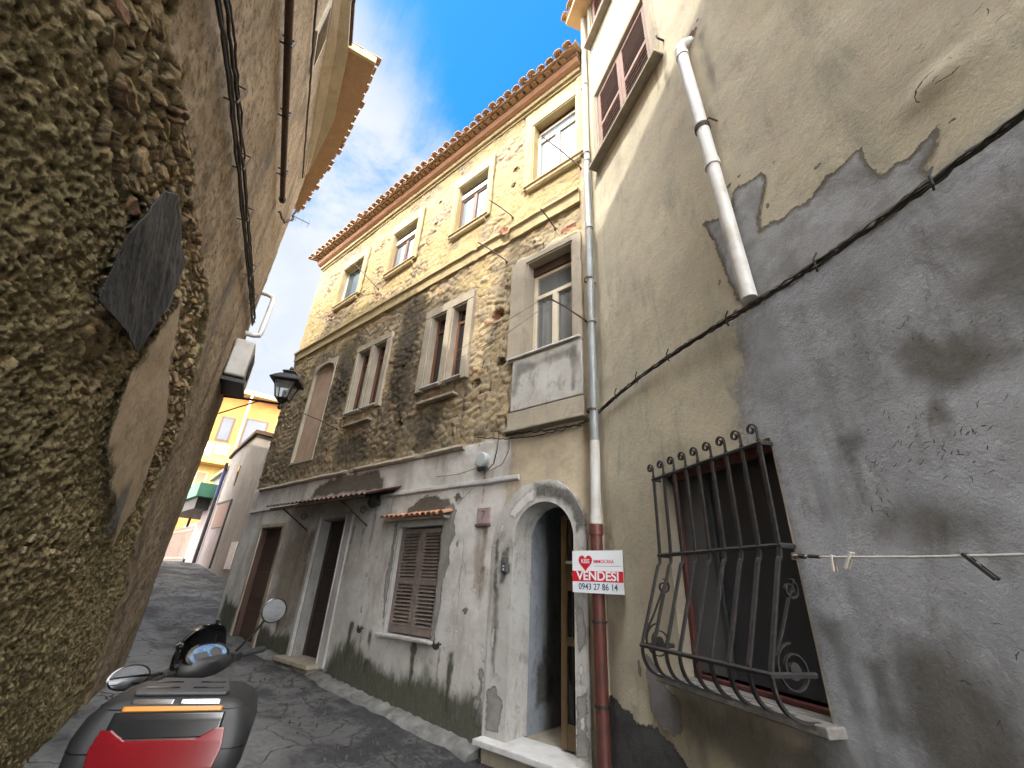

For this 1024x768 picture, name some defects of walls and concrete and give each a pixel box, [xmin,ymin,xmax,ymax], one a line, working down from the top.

crack [896,45,959,103]
peeling [702,118,1024,768]
leakage [325,621,482,751]
peeling [474,668,503,733]